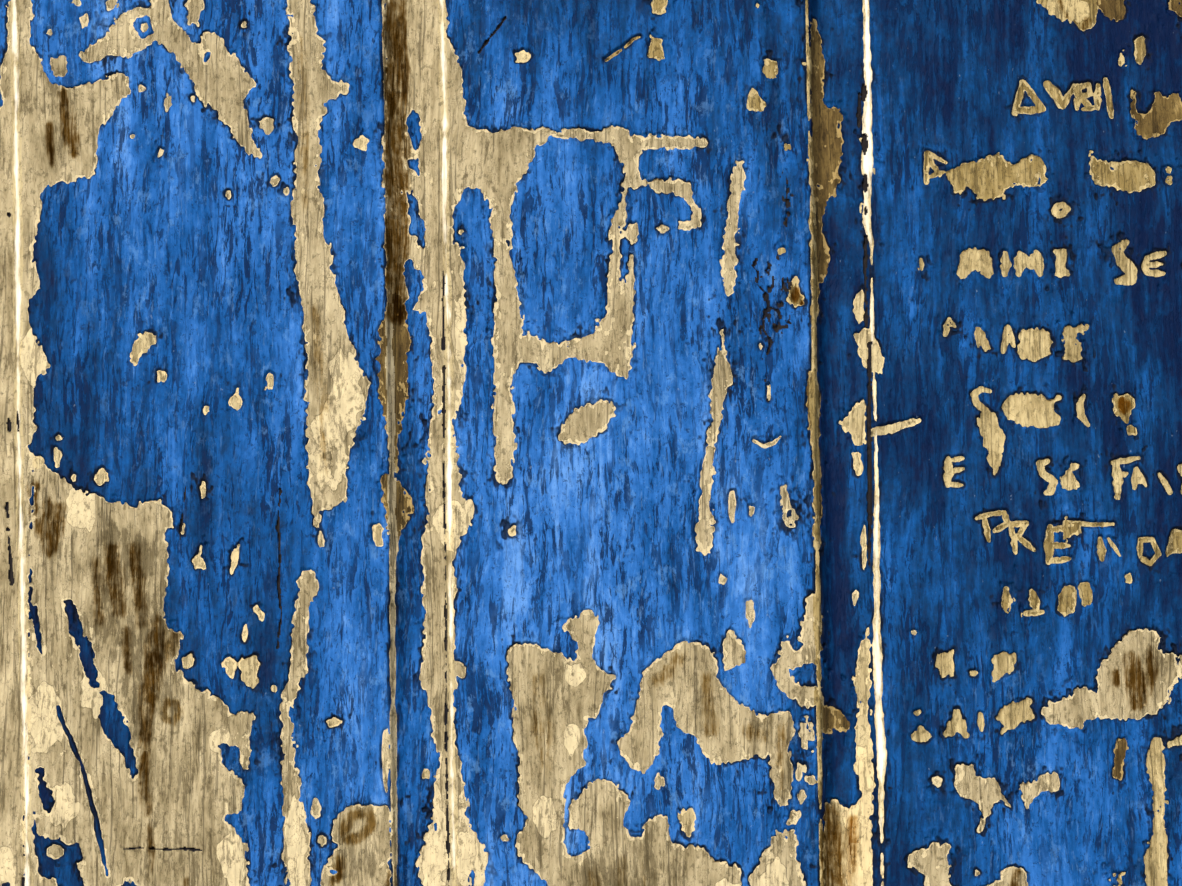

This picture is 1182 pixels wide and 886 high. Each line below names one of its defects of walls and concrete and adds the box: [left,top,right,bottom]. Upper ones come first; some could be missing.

peeling [1036,0,1126,31]
peeling [719,161,746,296]
peeling [853,290,885,374]
peeling [0,0,274,886]
peeling [270,0,708,886]
peeling [695,329,733,556]
peeling [839,399,921,476]
peeling [222,570,391,886]
peeling [501,594,878,886]
peeling [908,842,951,886]
peeling [932,764,1060,833]
peeling [1041,628,1182,729]